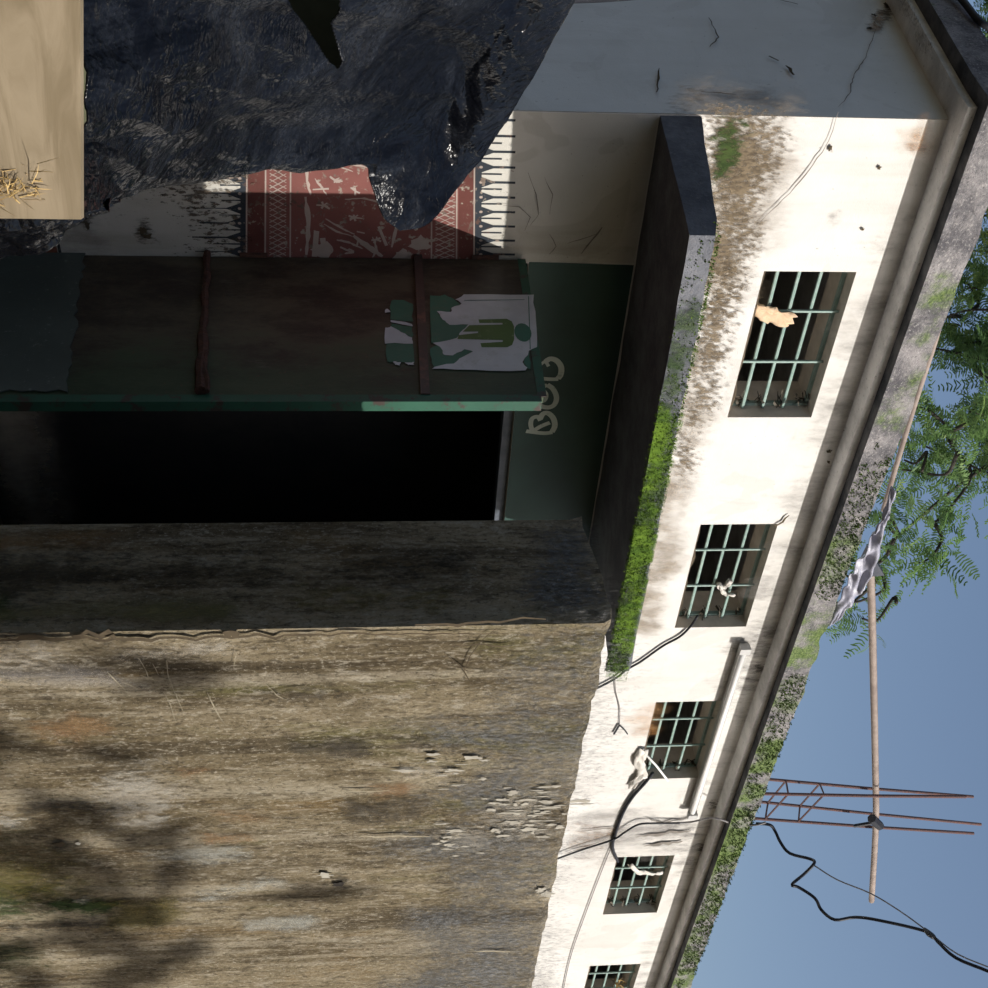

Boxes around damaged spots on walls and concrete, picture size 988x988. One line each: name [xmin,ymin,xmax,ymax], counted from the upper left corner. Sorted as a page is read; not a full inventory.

crack [755,28,877,228]
leakage [146,174,254,255]
leakage [673,101,791,475]
crack [0,617,546,684]
peeling [435,755,490,790]
peeling [425,823,489,857]
peeling [481,785,594,838]